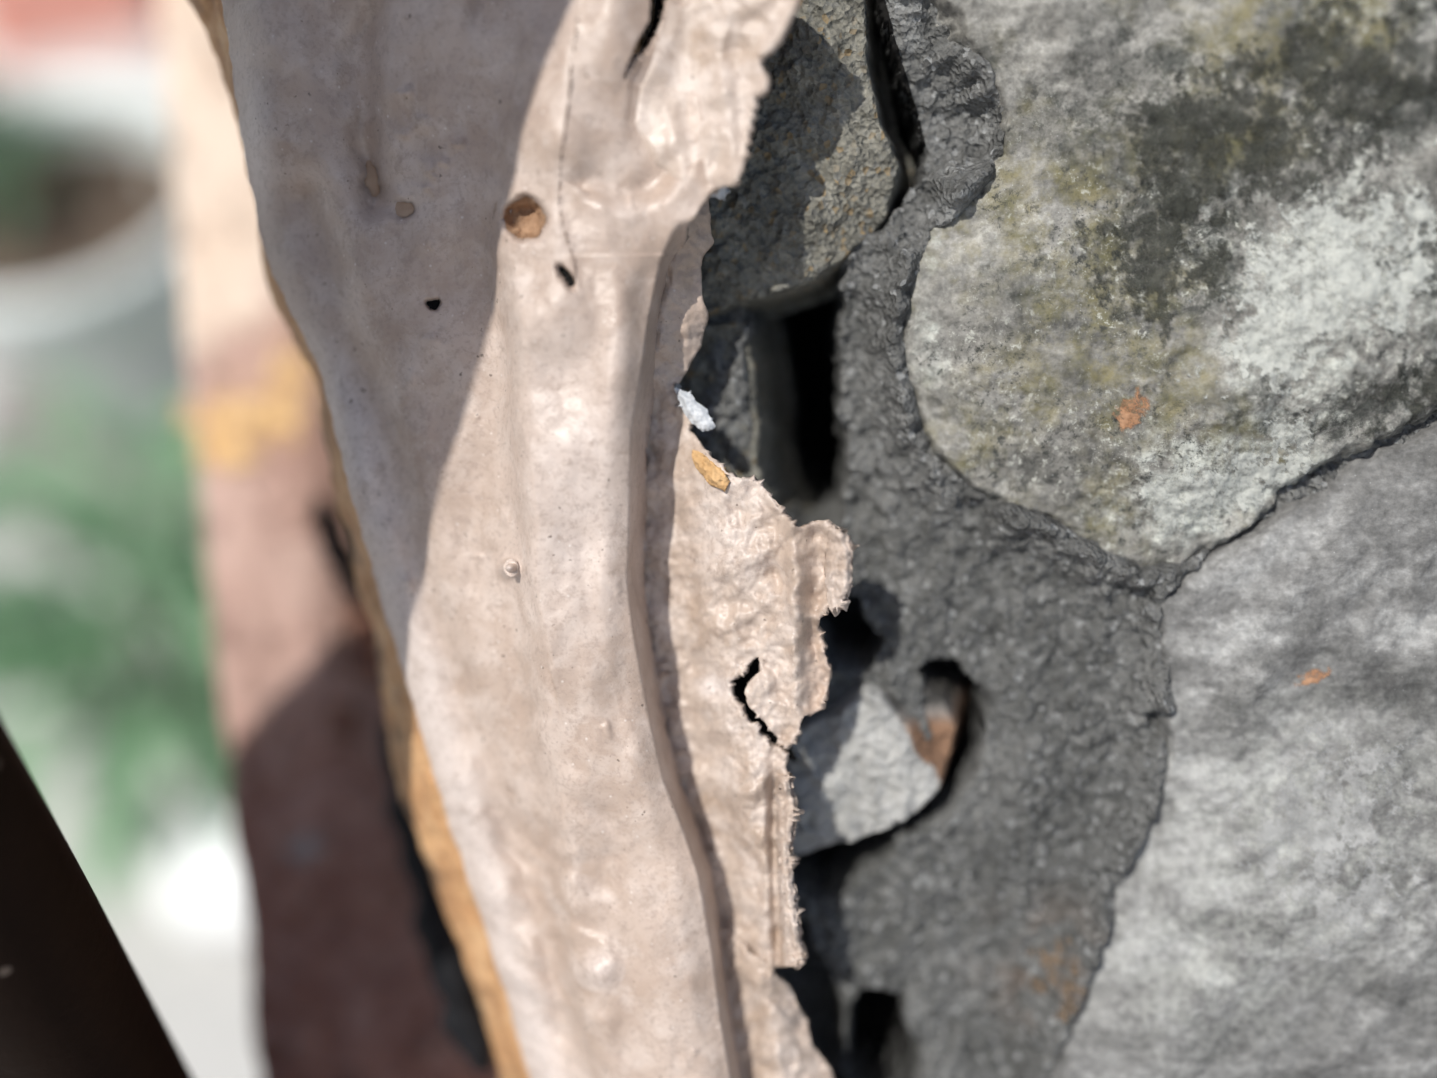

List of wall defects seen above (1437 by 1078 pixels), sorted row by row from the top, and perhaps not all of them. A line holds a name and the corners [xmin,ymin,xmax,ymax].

peeling [633,0,859,1078]
crack [733,657,798,762]
spalling [946,658,986,784]
spalling [903,794,935,836]
spalling [848,988,915,1078]